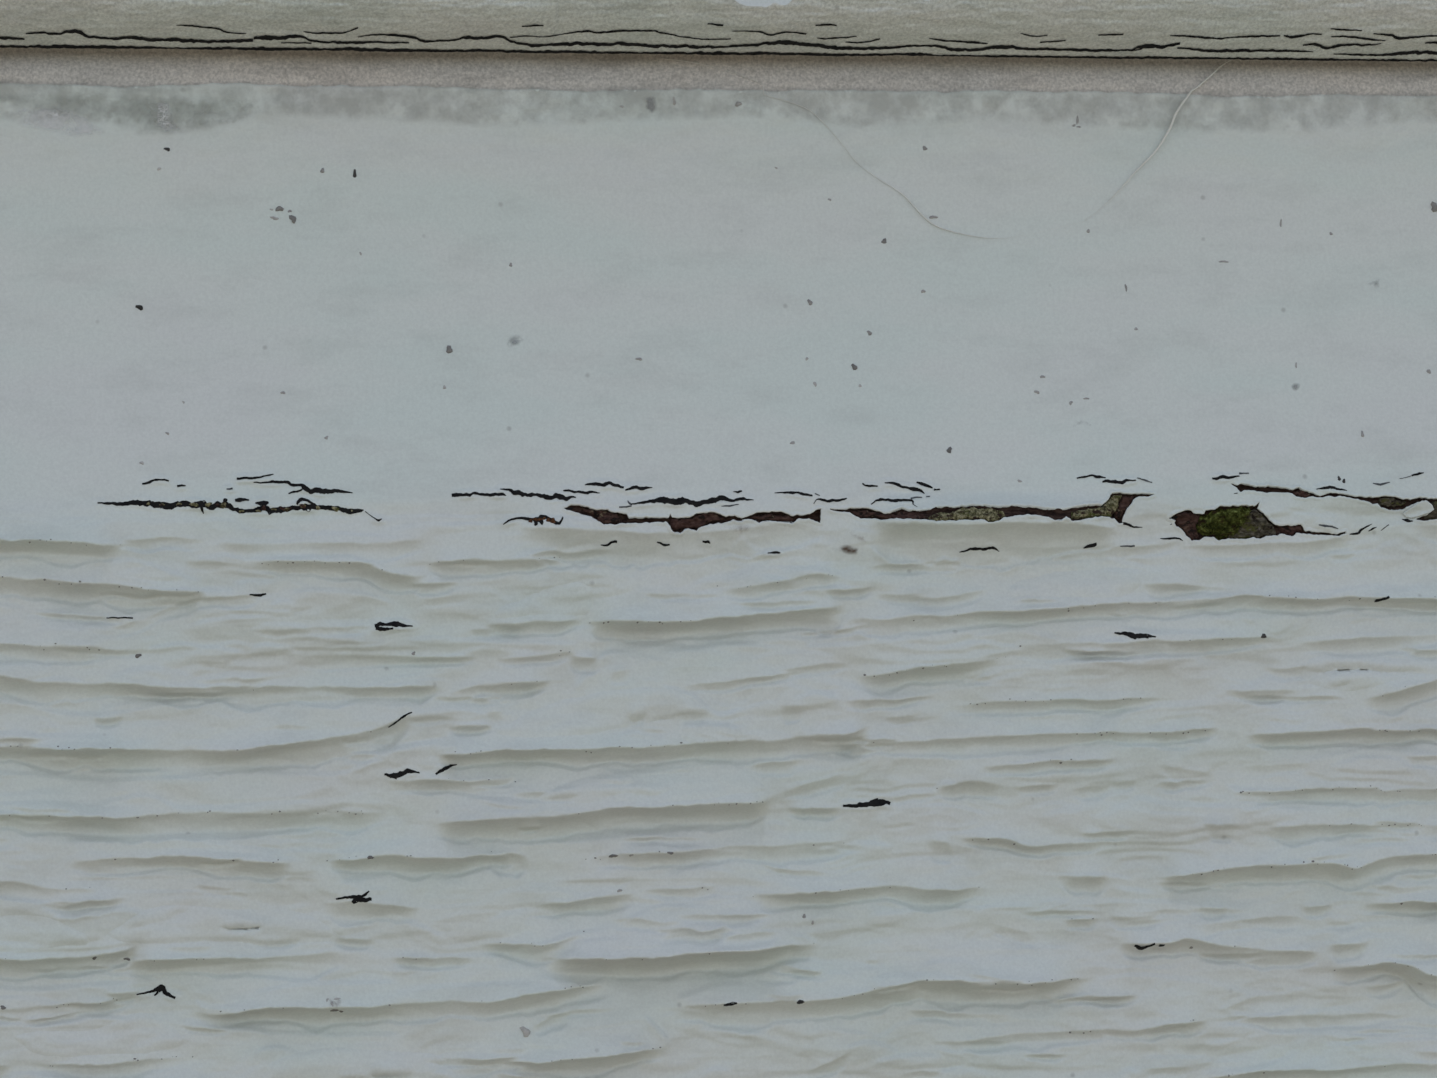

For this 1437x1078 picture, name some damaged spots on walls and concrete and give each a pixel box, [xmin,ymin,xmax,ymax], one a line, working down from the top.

crack [0,23,1437,56]
peeling [560,489,1157,537]
peeling [1165,480,1437,544]